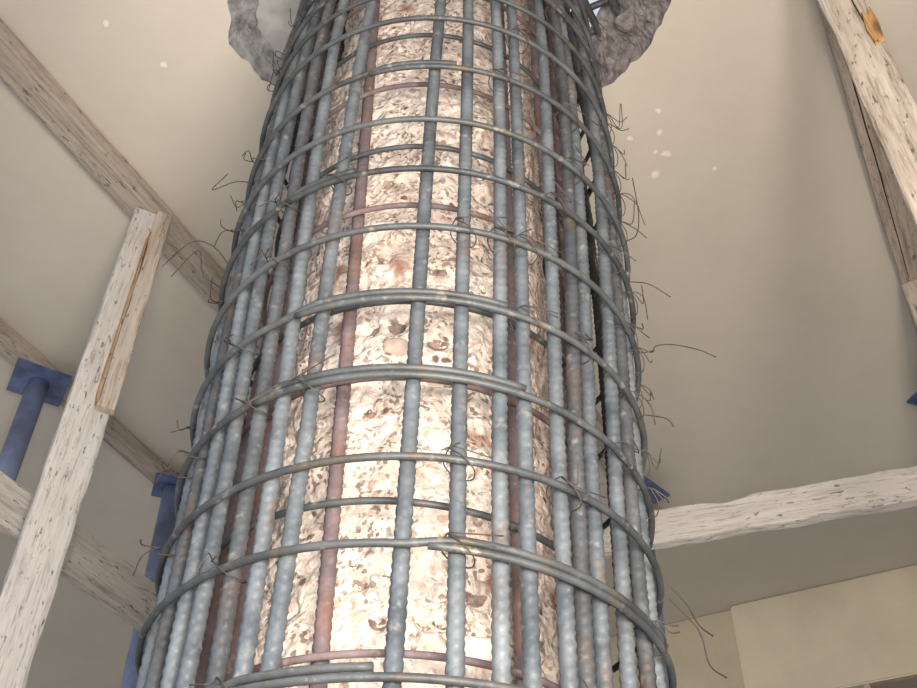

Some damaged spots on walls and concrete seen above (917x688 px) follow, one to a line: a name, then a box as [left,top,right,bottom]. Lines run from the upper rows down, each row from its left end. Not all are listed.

spalling [136,0,351,688]
spalling [317,0,380,300]
spalling [338,301,469,370]
spalling [412,0,537,554]
spalling [528,0,674,629]
spalling [368,378,542,688]
spalling [555,578,667,688]